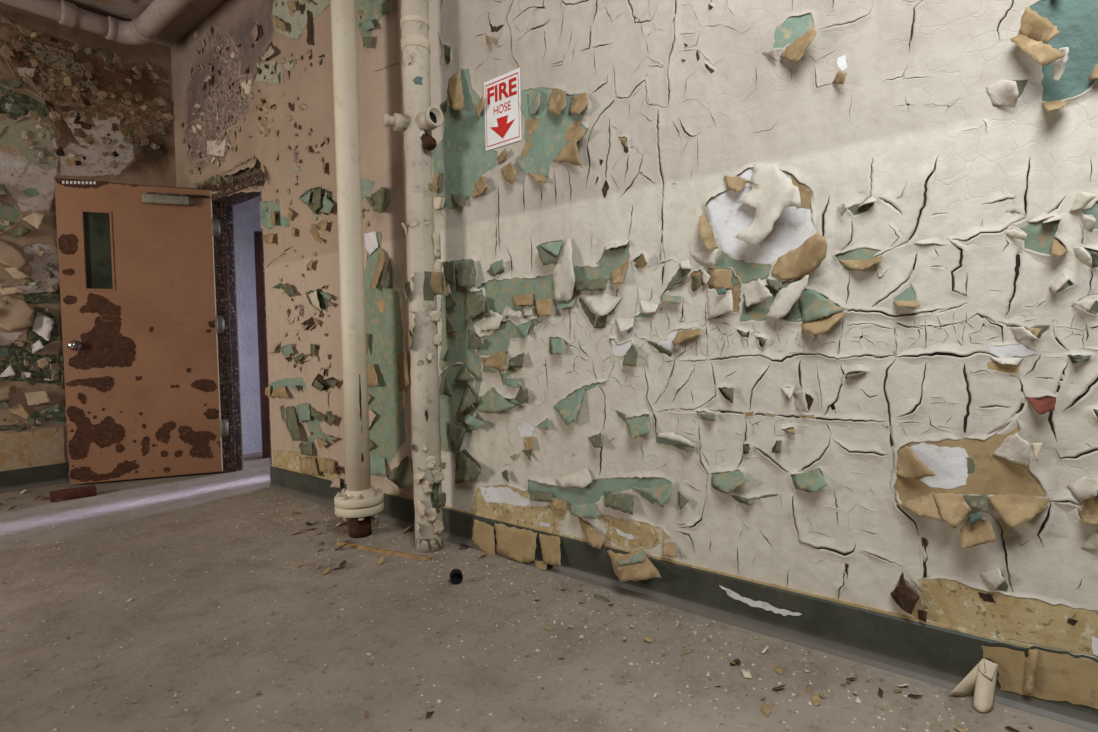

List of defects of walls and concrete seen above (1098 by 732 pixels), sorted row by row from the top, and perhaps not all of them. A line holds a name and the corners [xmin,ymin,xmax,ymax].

peeling [355,0,392,51]
crack [437,0,445,67]
peeling [428,42,592,215]
peeling [832,51,851,84]
peeling [986,0,1098,111]
corrosion [58,234,79,255]
peeling [0,0,341,488]
corrosion [63,293,221,482]
peeling [361,161,887,582]
peeling [890,389,1098,549]
peeling [885,562,1098,711]